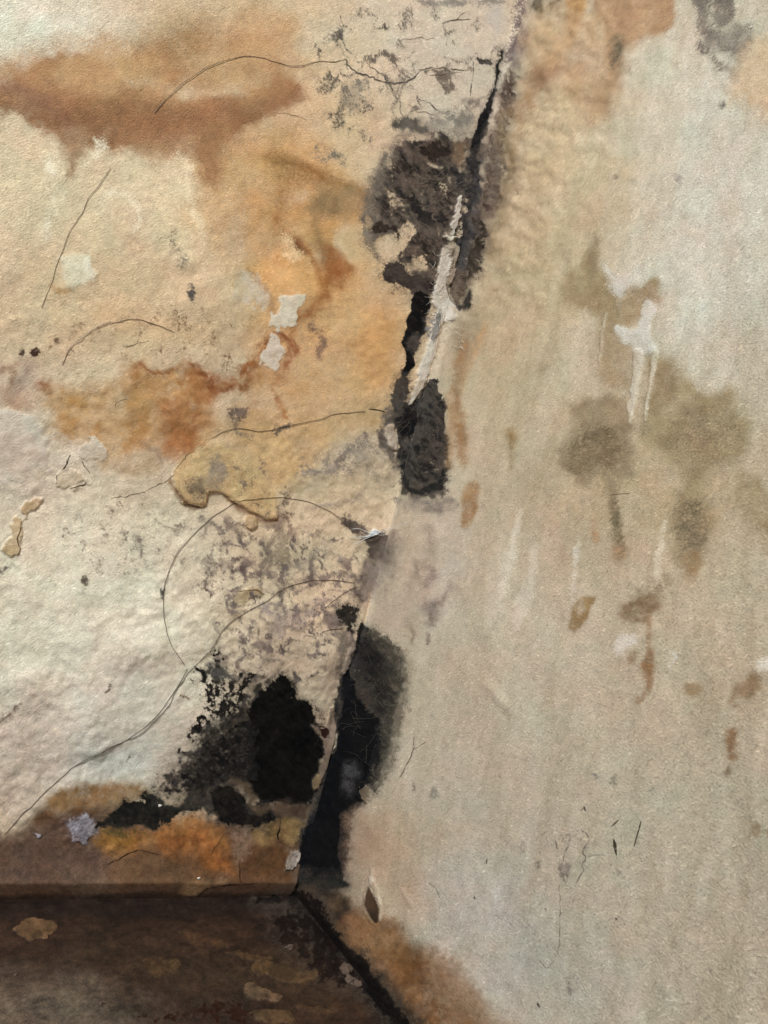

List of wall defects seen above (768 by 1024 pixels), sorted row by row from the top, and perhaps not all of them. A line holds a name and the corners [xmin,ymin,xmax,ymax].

corrosion [0,0,324,194]
peeling [0,404,109,558]
corrosion [0,239,357,467]
leakage [0,0,530,896]
flaking render [224,261,308,373]
leakage [552,228,768,611]
corrosion [39,776,144,819]
corrosion [91,820,293,898]
corrosion [318,802,500,1024]
crack [399,737,428,778]